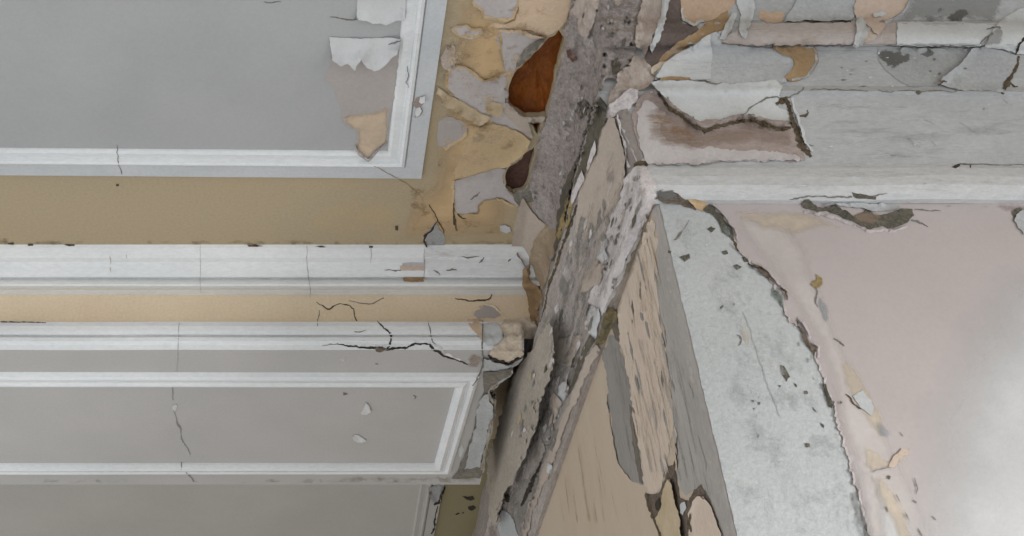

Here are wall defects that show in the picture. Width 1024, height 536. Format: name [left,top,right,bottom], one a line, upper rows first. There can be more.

peeling [332,0,406,25]
peeling [324,37,401,162]
crack [306,257,492,386]
flaking render [387,0,1024,536]
crack [172,326,194,482]